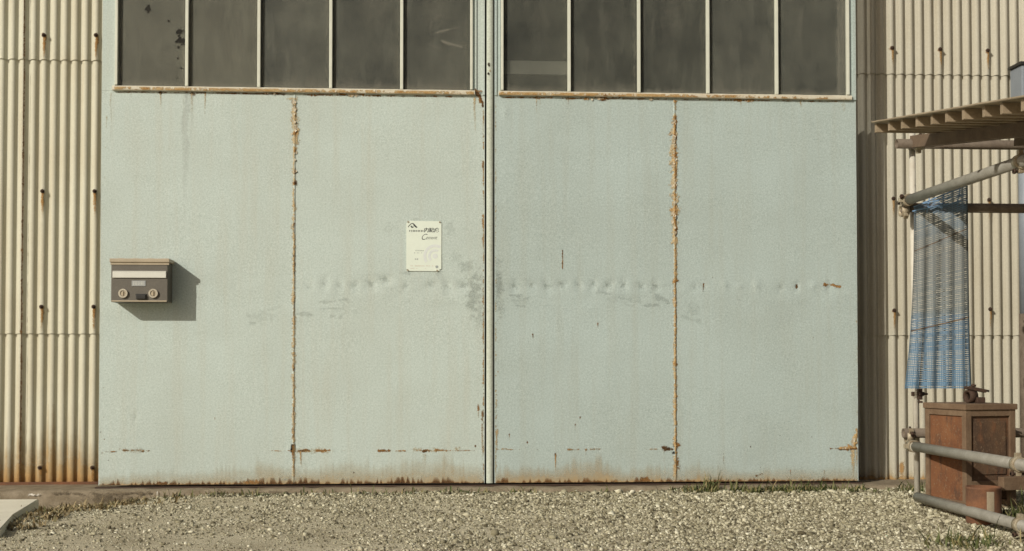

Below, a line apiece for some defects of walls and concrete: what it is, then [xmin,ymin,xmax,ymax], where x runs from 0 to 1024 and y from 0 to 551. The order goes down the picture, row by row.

rust [114,87,484,123]
rust [499,92,846,104]
rust [0,176,926,485]